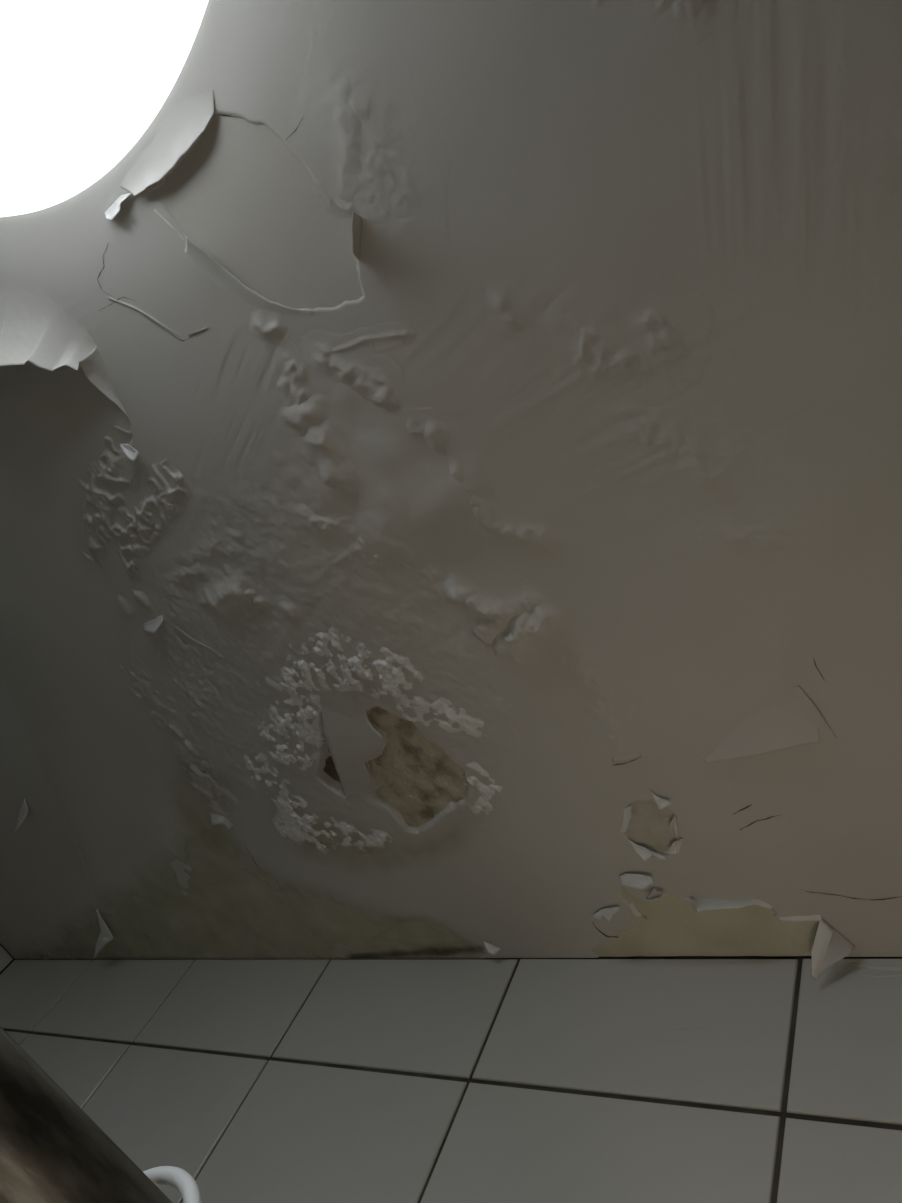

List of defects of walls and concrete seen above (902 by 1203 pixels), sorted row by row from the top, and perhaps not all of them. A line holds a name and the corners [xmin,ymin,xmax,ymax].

crack [97,244,208,341]
peeling [104,90,363,316]
peeling [0,285,501,959]
leakage [238,627,484,854]
leakage [464,762,502,815]
leakage [63,833,473,959]
peeling [592,790,856,980]